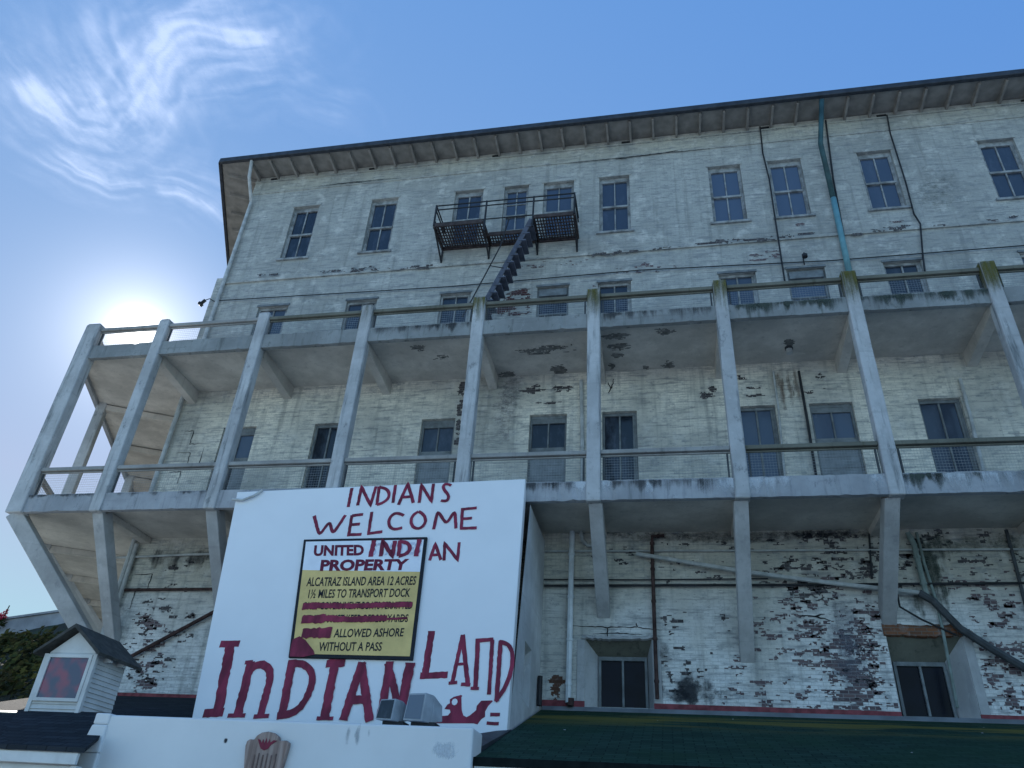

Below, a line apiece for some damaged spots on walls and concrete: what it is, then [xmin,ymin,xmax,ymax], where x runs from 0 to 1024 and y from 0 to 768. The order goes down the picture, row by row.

peeling [515,344,573,404]
peeling [601,333,631,369]
peeling [123,584,195,693]
peeling [661,612,707,692]
water stain [671,674,712,705]
spalling [722,532,899,711]
spalling [898,529,1024,714]